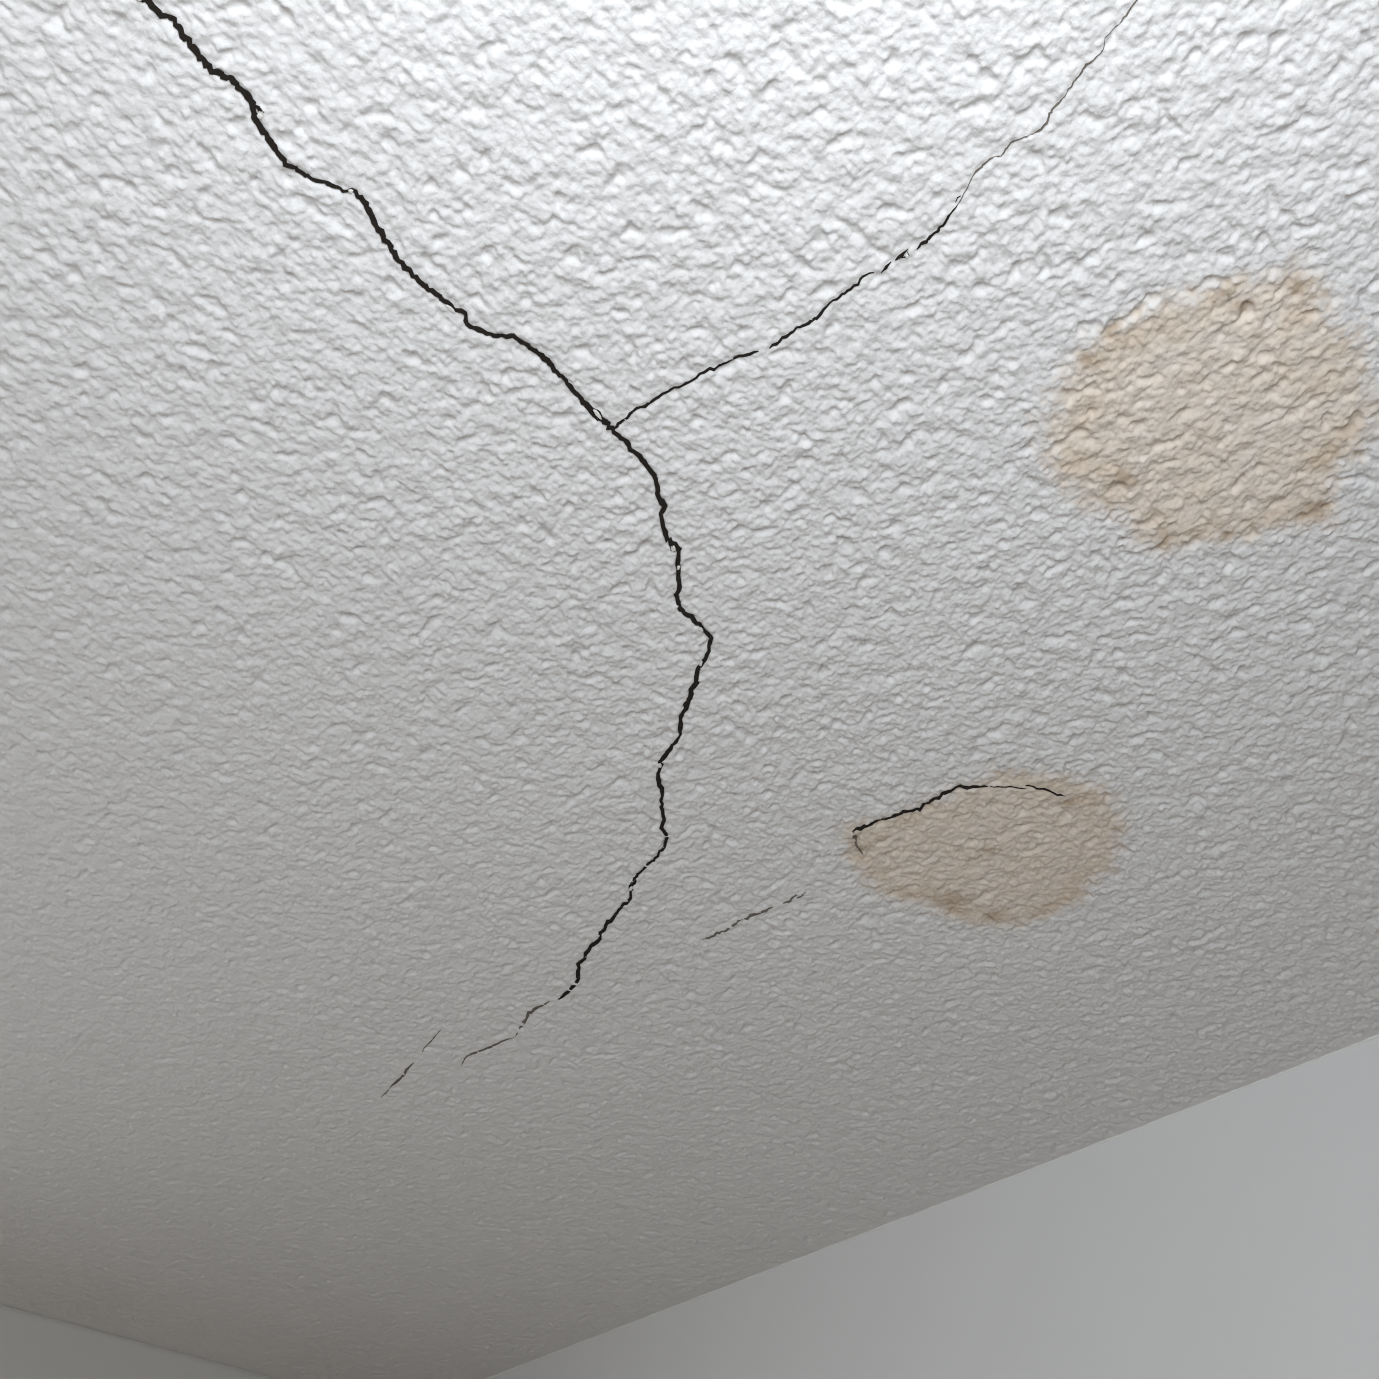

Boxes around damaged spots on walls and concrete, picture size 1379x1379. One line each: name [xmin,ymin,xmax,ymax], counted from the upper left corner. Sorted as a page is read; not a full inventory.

crack [138,0,1138,1066]
leakage [1015,242,1379,565]
leakage [826,758,1147,937]
crack [381,1030,441,1098]